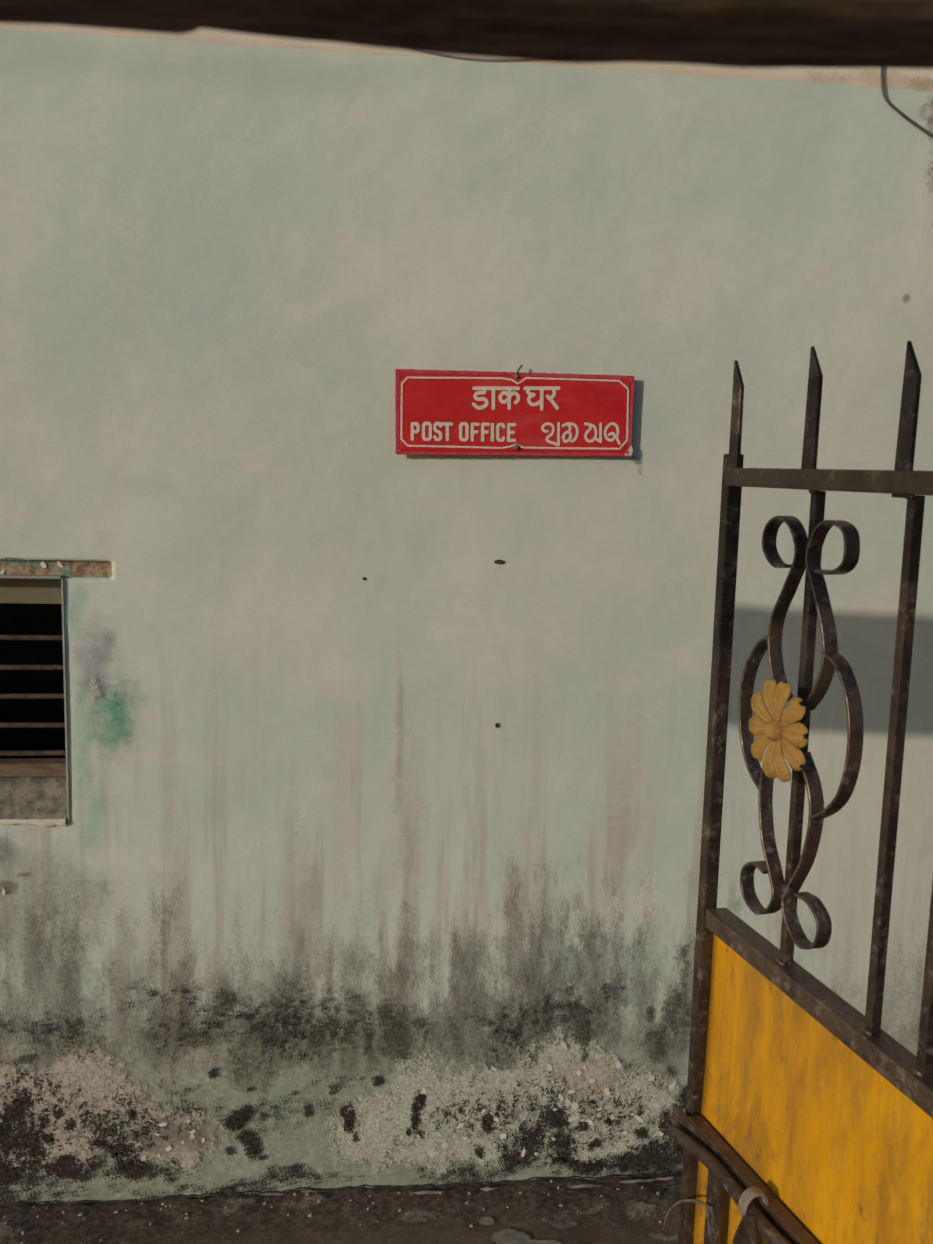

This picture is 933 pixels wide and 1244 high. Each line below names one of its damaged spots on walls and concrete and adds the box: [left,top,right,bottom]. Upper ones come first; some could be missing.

water stain [0,912,695,1238]